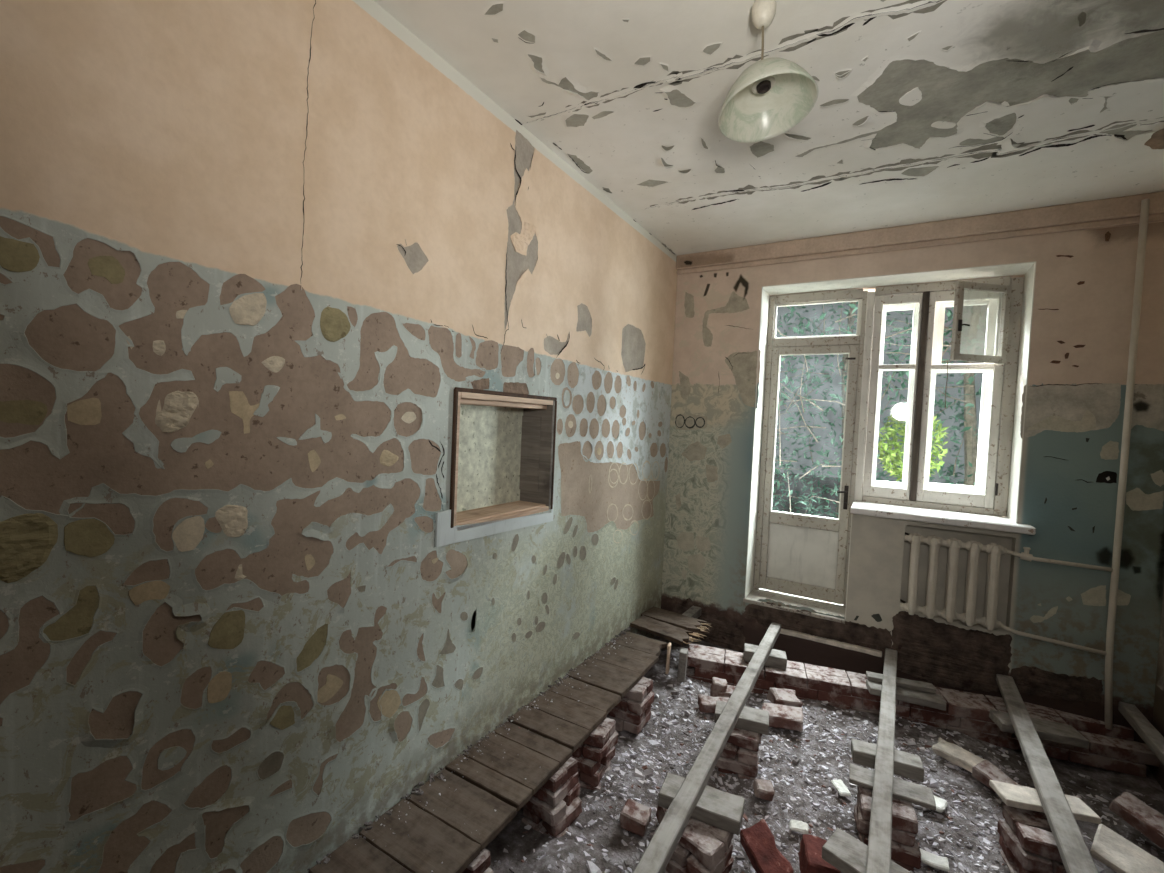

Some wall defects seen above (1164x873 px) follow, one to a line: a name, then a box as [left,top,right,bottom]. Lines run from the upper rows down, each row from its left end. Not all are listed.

peeling [482,0,507,17]
peeling [699,41,724,56]
peeling [745,8,1164,164]
crack [297,0,319,290]
peeling [698,137,728,174]
peeling [896,163,944,178]
peeling [681,289,752,349]
peeling [722,348,761,410]
peeling [1020,340,1164,443]
peeling [0,28,710,873]
spalling [1094,469,1119,486]
spalling [669,595,1105,707]